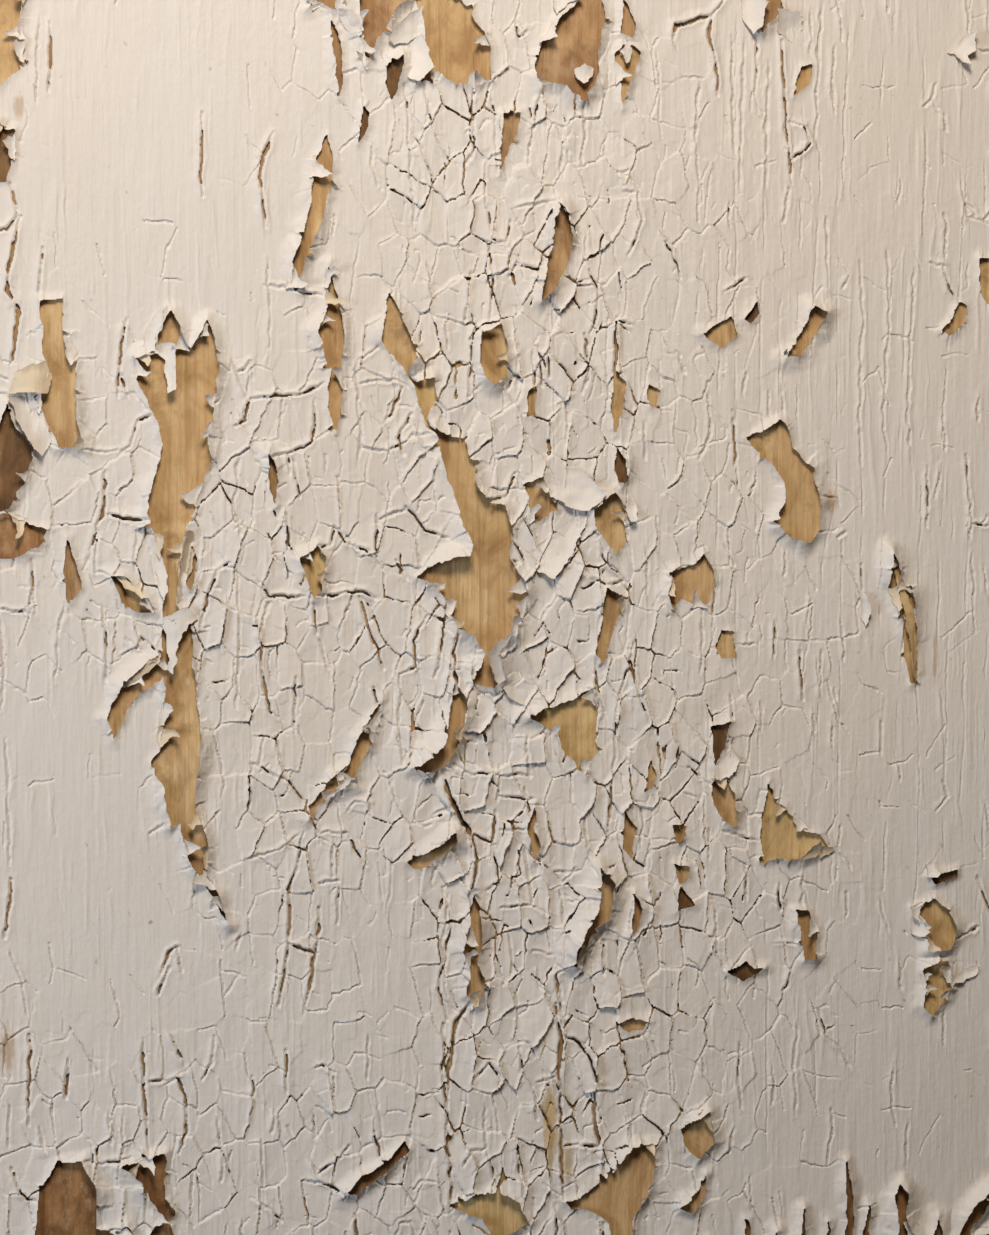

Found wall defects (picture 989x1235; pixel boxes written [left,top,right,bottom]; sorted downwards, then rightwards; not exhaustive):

crack [0,189,59,384]
peeling [0,283,243,939]
crack [196,109,207,199]
crack [240,129,300,231]
crack [0,237,924,1235]
peeling [278,0,651,447]
peeling [370,279,665,790]
crack [349,0,826,656]
peeling [730,405,834,557]
crack [859,344,989,939]
peeling [19,1137,191,1235]
peeling [437,1098,724,1235]